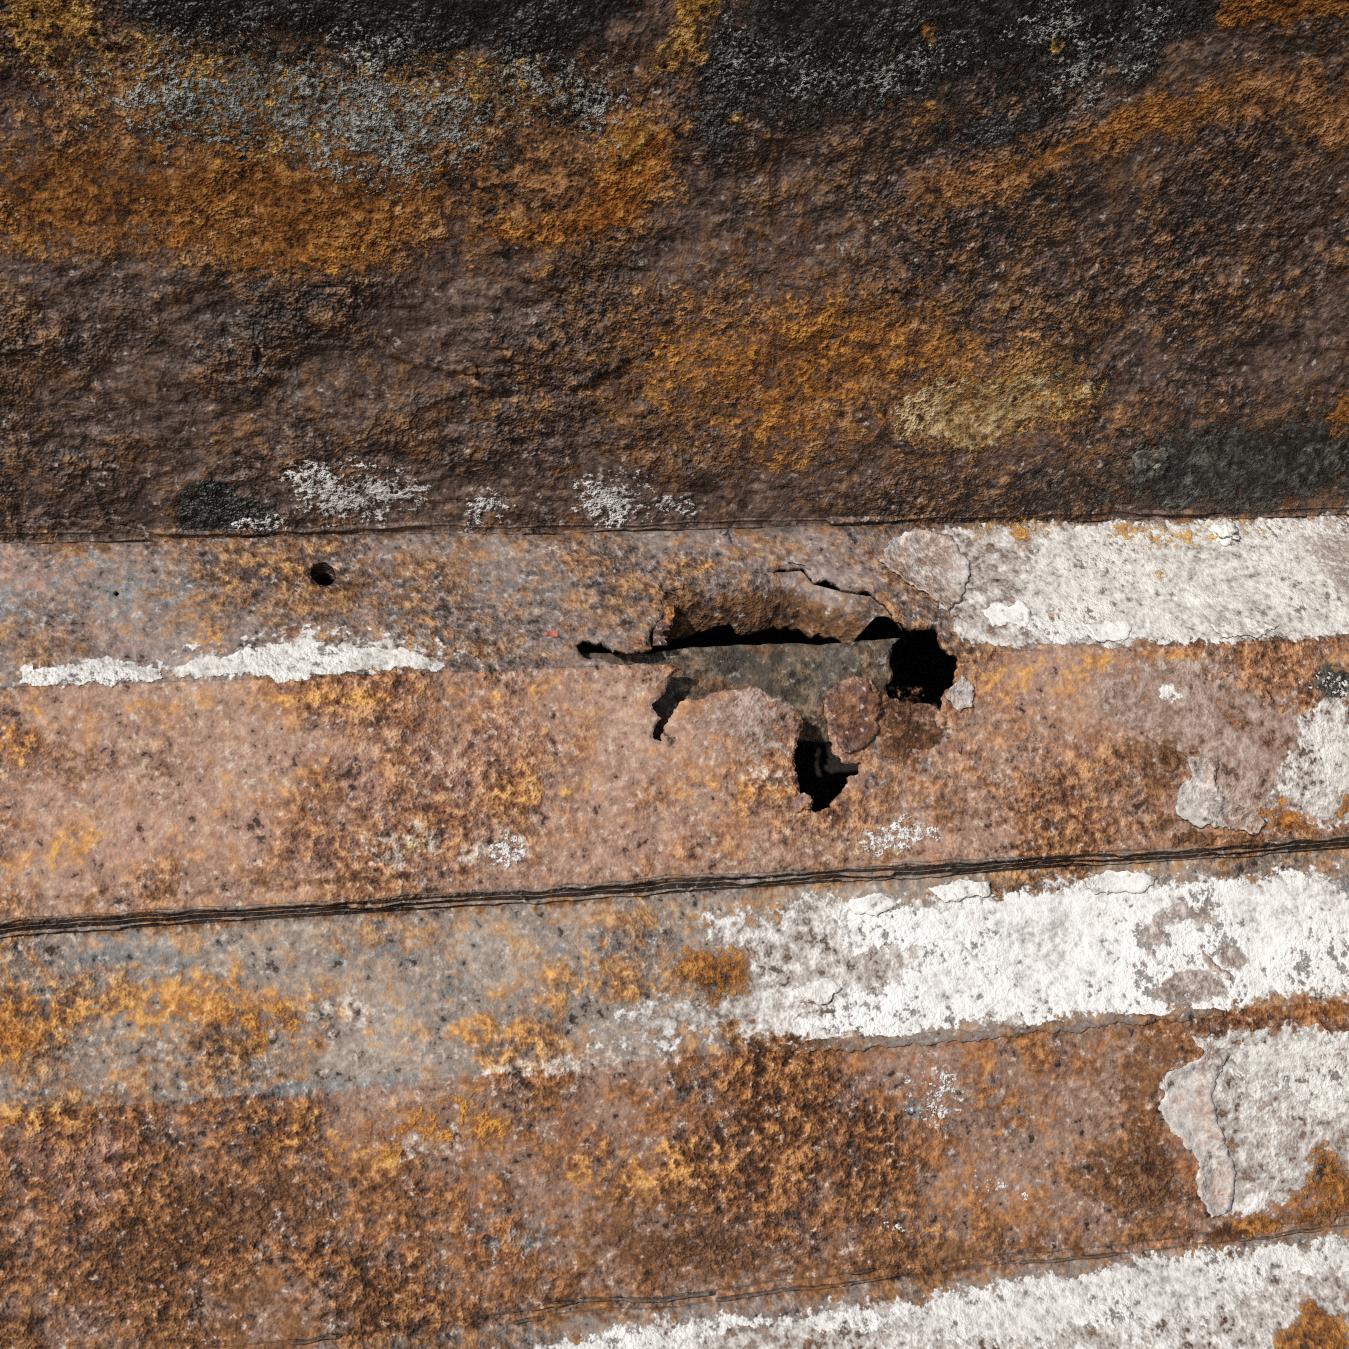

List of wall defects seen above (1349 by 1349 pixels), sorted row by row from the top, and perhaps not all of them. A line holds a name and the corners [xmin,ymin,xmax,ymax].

rust [1215,0,1349,29]
rust [0,0,722,282]
rust [909,58,1349,214]
rust [564,262,1102,480]
rust [1326,393,1349,438]
peeling [827,672,883,753]
peeling [879,511,1349,835]
peeling [793,793,813,813]
peeling [586,862,1349,1219]
rust [147,1162,336,1289]
rust [190,1033,1349,1349]